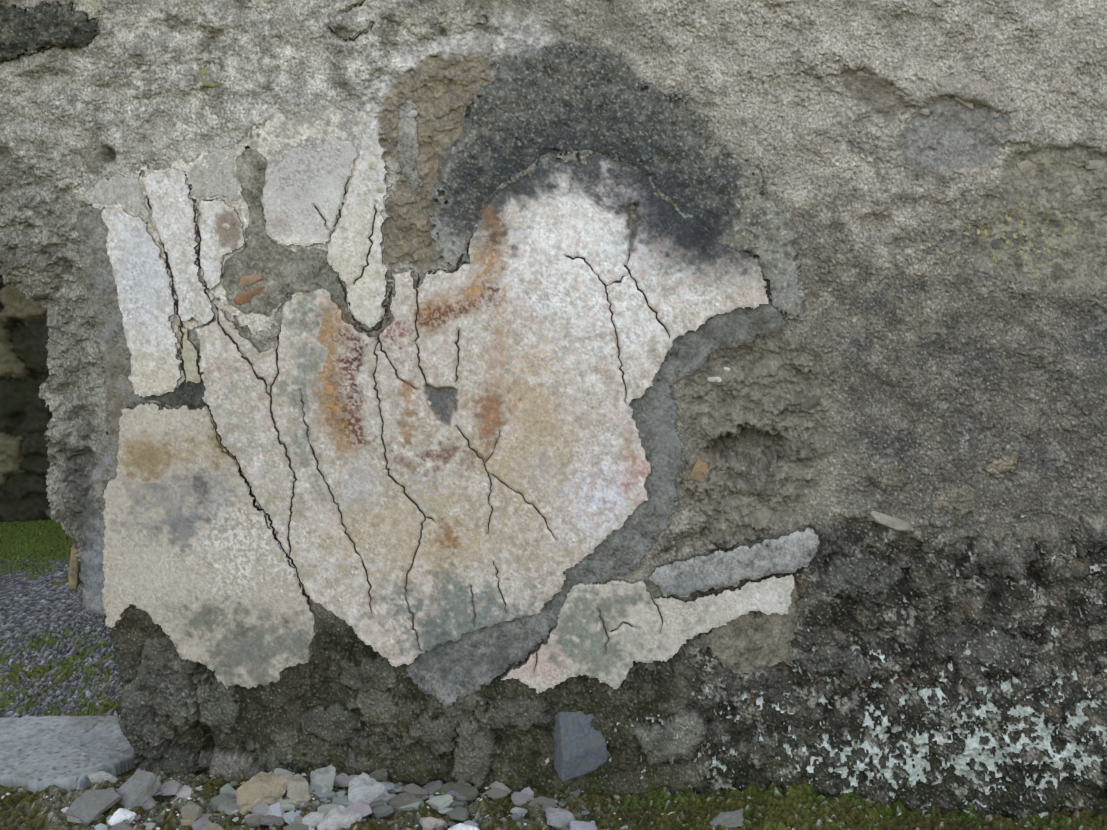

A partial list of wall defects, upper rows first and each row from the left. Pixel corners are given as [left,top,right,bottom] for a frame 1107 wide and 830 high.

crack [145,196,186,379]
crack [185,174,372,611]
crack [335,206,469,649]
spalling [368,56,488,268]
spalling [427,385,457,422]
crack [457,426,556,539]
water stain [433,97,749,265]
crack [565,250,670,403]
spalling [628,205,640,236]
spalling [690,460,788,508]
spalling [701,361,821,437]
crack [597,597,663,655]